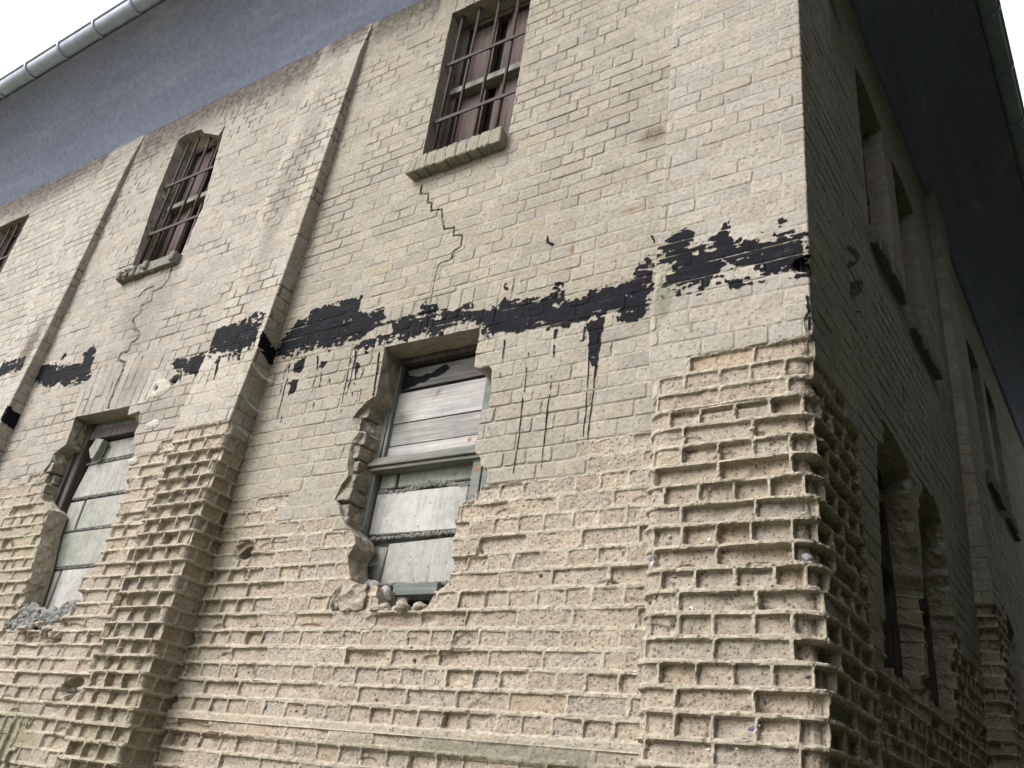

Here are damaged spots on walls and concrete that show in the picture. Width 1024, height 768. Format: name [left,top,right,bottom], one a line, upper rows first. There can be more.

crack [420,186,463,259]
spalling [0,337,1024,768]